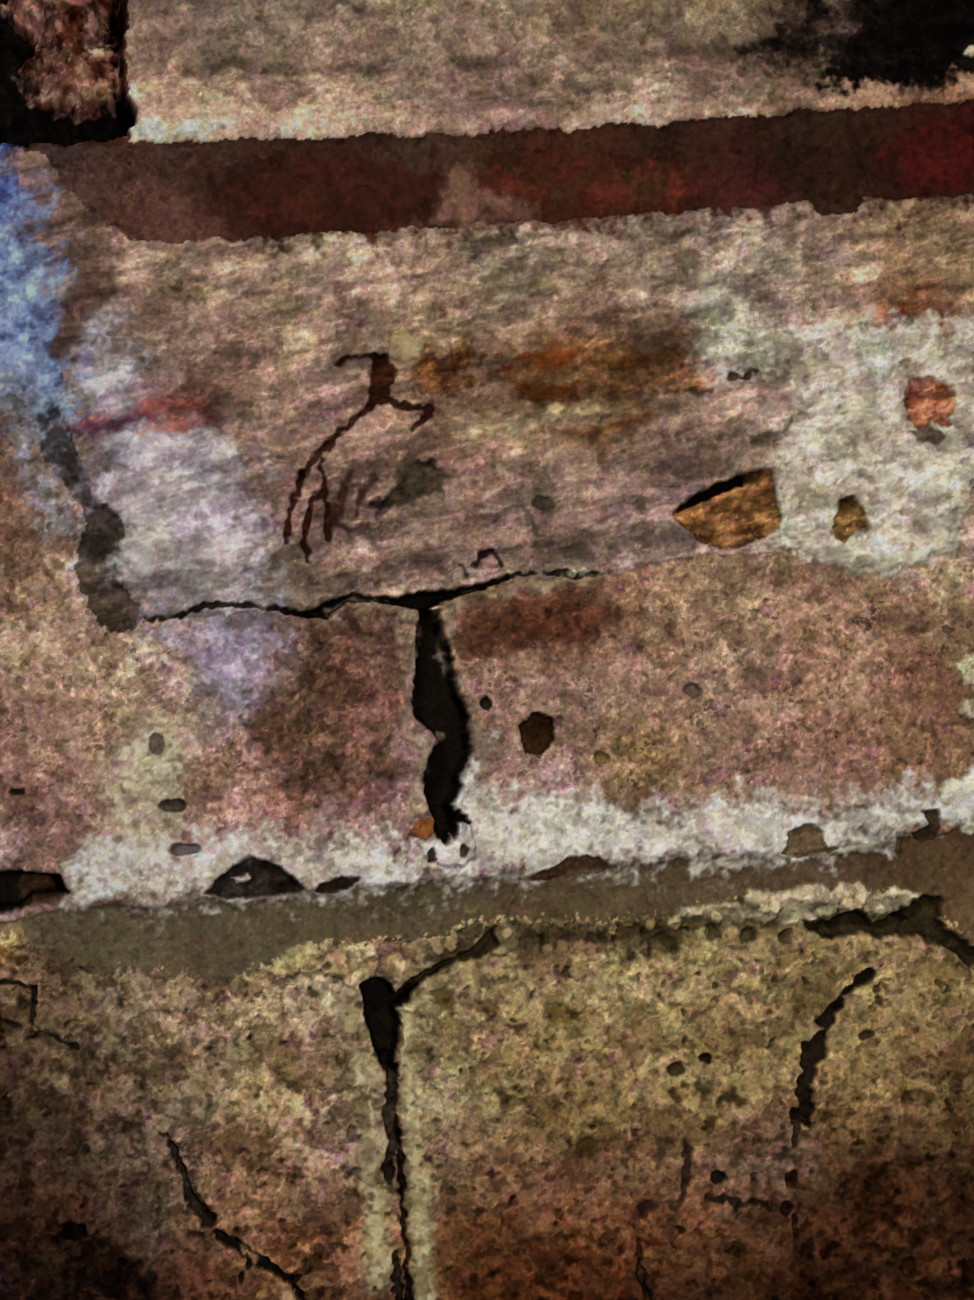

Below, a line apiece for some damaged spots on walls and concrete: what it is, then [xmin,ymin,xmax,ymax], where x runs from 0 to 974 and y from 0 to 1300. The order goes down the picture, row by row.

crack [283,352,435,563]
corrosion [411,326,710,445]
spalling [673,468,781,548]
spalling [831,496,871,544]
spalling [904,376,956,444]
crack [145,567,600,845]
leakage [60,574,957,914]
crack [0,922,79,1050]
crack [159,1133,322,1300]
crack [359,927,500,1300]
crack [636,968,875,1300]